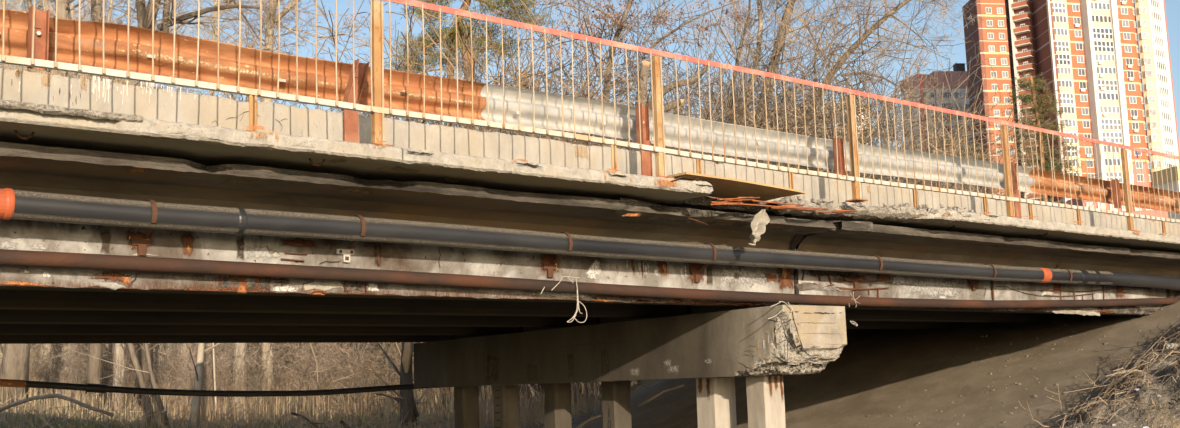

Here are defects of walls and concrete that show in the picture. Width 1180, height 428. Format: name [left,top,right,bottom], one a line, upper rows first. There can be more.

spalling [282,136,319,147]
spalling [684,181,713,193]
spalling [611,196,999,235]
rust [540,253,558,272]
rust [616,259,713,284]
peeling [791,323,801,347]